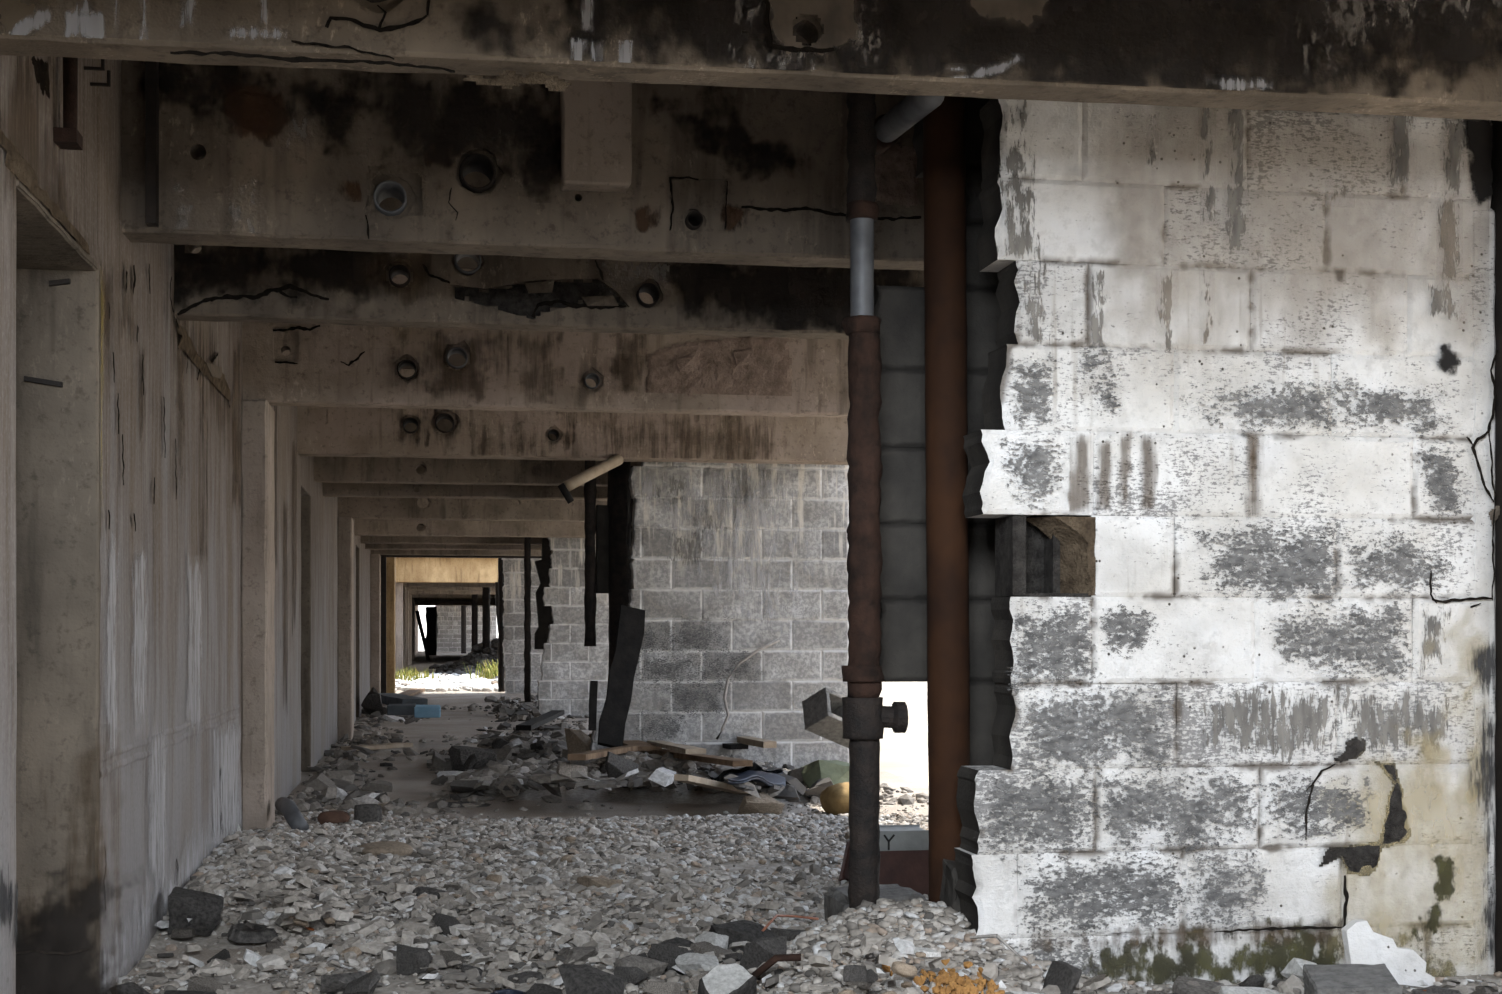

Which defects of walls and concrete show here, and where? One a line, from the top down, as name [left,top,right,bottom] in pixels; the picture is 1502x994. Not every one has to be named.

crack [170,0,455,73]
crack [170,277,329,408]
crack [341,351,365,366]
peeling [455,279,625,319]
peeling [997,100,1122,510]
peeling [980,519,1453,978]
crack [1305,763,1336,840]
water stain [1160,929,1212,944]